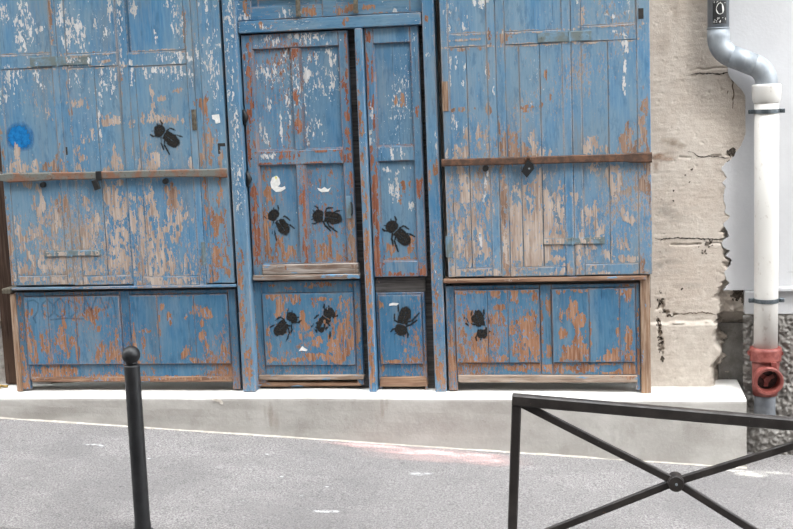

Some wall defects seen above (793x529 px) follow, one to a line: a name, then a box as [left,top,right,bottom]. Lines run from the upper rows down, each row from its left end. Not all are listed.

peeling [0,0,651,391]
crack [656,235,727,243]
flaking render [730,290,744,306]